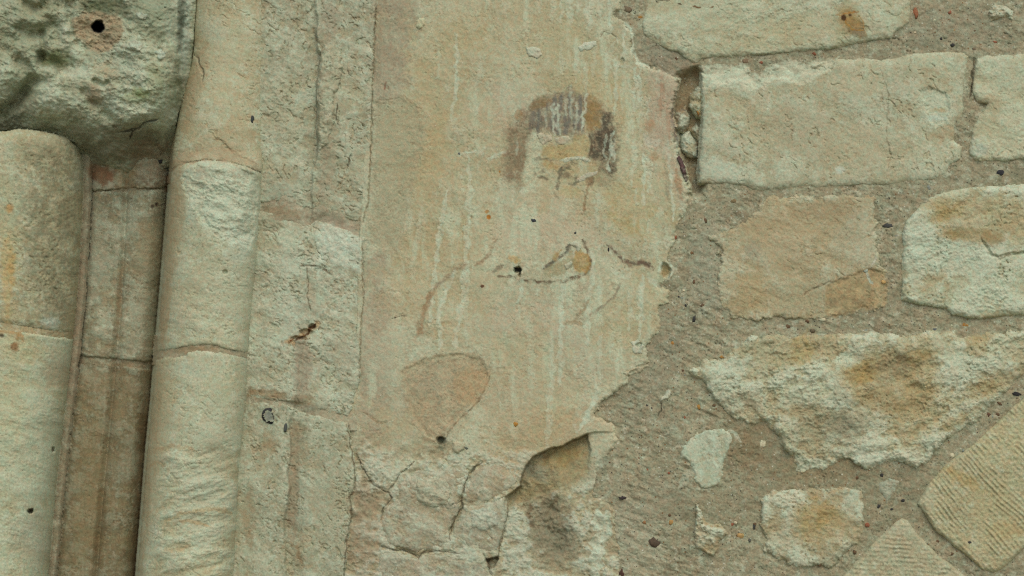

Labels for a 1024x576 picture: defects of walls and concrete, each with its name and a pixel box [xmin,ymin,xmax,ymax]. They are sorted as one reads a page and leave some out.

damp [535,0,650,138]
damp [412,140,520,351]
damp [601,129,616,173]
damp [628,129,686,251]
efflorescence [525,275,567,451]
damp [572,249,675,434]
crack [343,412,415,576]
crack [385,462,508,576]
spalling [503,429,596,572]